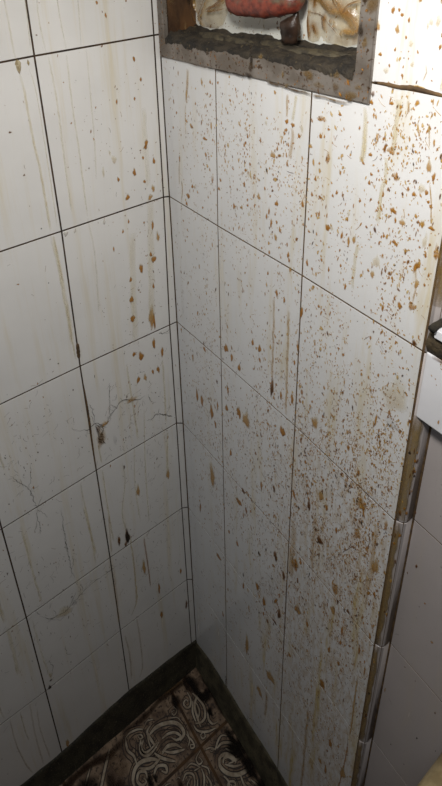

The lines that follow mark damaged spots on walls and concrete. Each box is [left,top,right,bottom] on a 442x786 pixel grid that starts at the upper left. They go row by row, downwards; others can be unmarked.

rust [353,0,380,57]
crack [86,390,172,444]
rust [169,48,442,786]